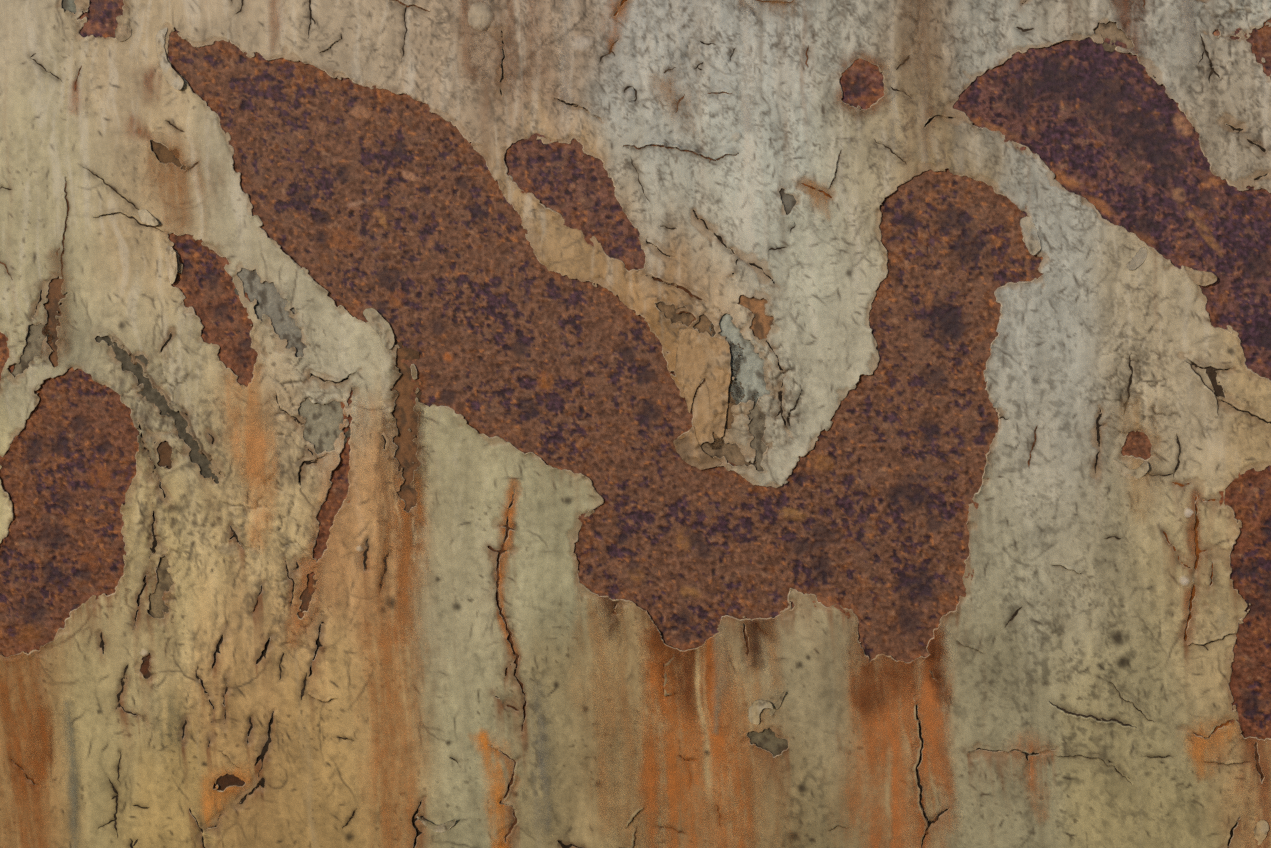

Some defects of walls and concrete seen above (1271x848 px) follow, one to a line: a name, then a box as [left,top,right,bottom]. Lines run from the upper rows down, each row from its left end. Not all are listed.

peeling [61,0,132,42]
peeling [952,14,1271,382]
peeling [0,276,141,658]
crack [98,752,149,848]
crack [94,329,226,630]
crack [182,558,337,848]
crack [487,489,527,848]
peeling [138,27,1044,663]
rust [643,629,699,848]
rust [705,637,752,848]
rust [852,631,945,848]
peeling [1219,465,1271,743]